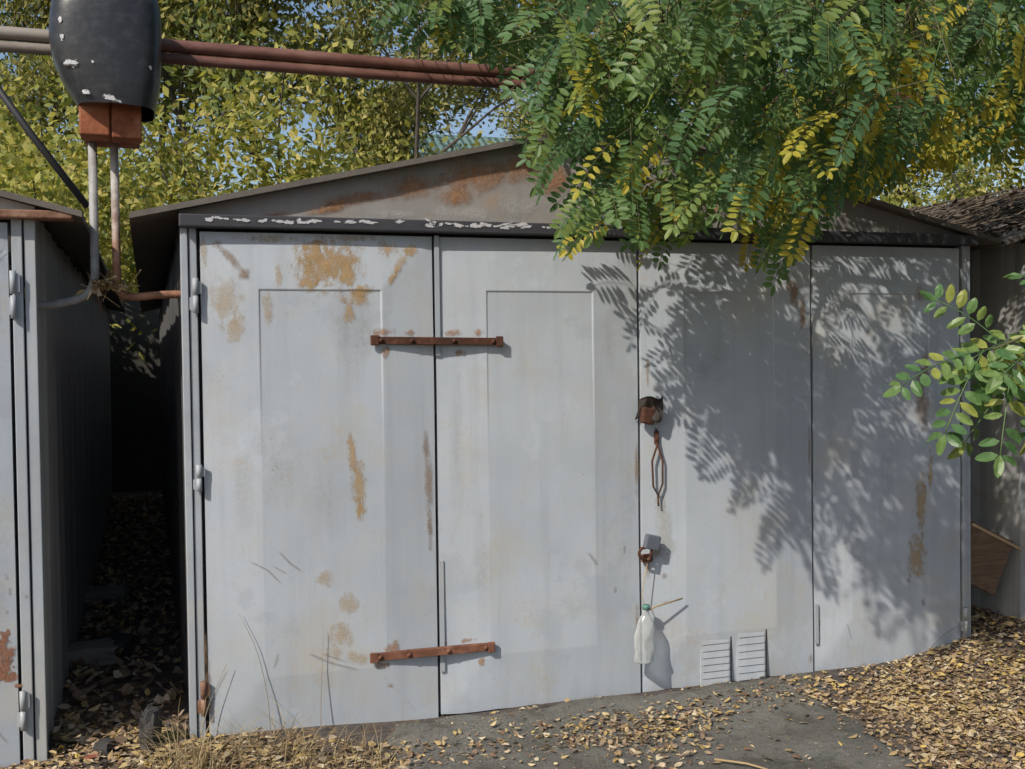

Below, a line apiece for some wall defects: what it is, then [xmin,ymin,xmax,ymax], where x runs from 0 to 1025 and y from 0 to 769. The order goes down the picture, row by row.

peeling [205,216,377,224]
rust [312,193,373,213]
peeling [425,218,560,230]
rust [447,156,566,203]
rust [295,236,370,320]
rust [347,436,364,518]